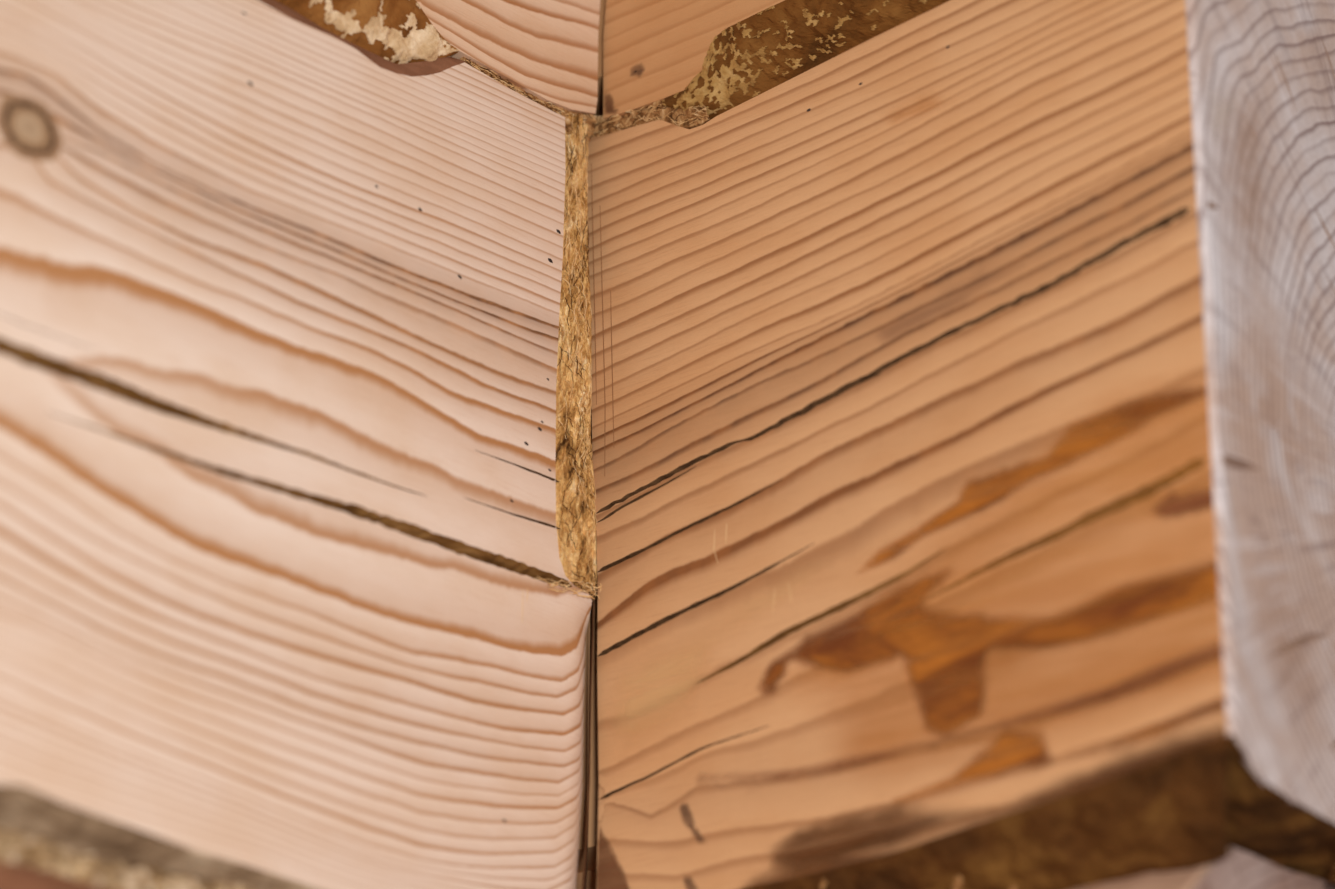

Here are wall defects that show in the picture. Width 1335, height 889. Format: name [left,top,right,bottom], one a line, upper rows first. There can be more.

crack [0,338,783,588]
crack [597,544,813,657]
crack [596,201,1218,523]
crack [694,454,1261,685]
crack [1271,633,1327,656]